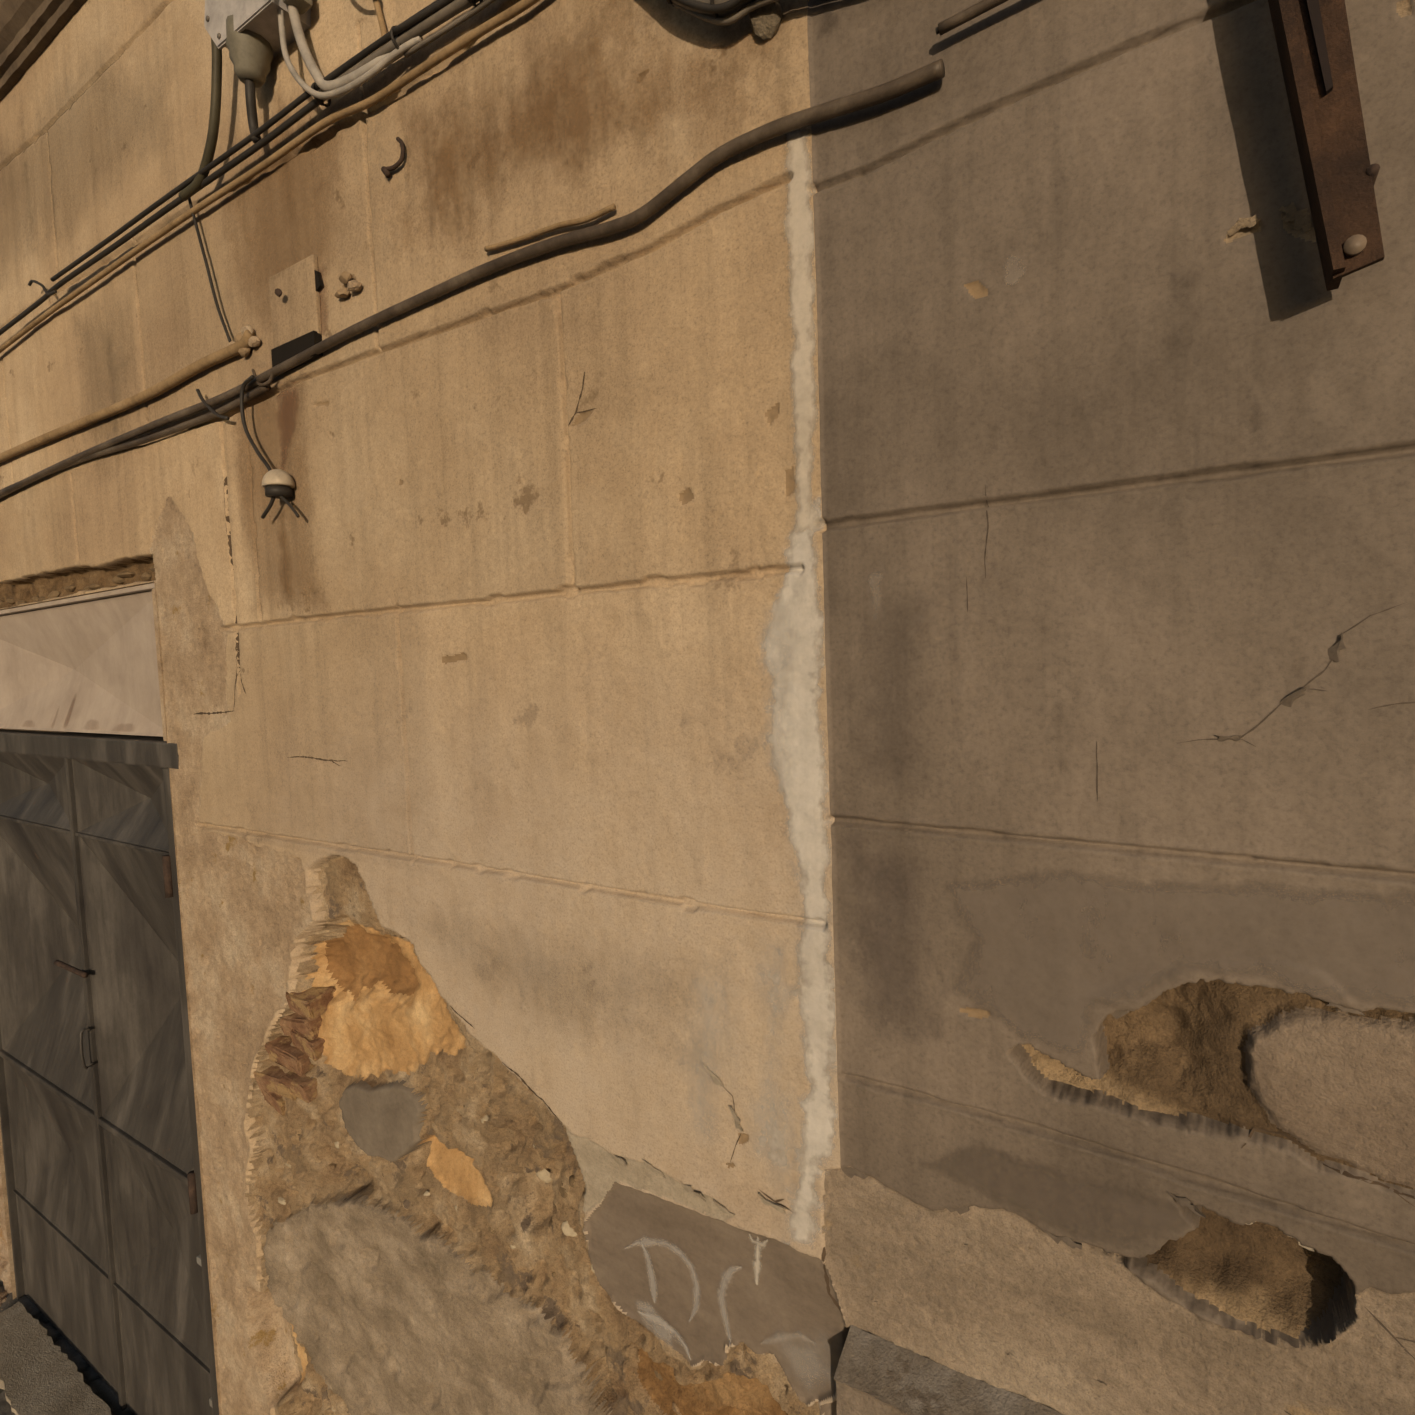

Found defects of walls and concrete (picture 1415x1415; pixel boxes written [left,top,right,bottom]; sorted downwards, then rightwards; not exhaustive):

crack [1181,603,1404,747]
flaking render [0,497,820,1415]
crack [699,1061,744,1162]
crack [761,1191,793,1213]
peeling [822,1166,1415,1415]
flaking render [1022,979,1415,1190]